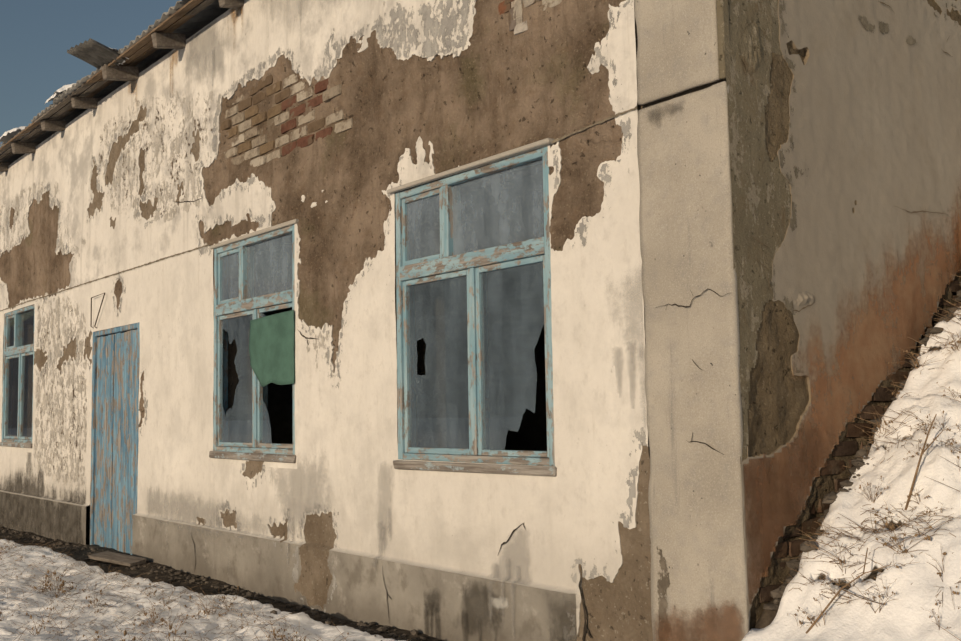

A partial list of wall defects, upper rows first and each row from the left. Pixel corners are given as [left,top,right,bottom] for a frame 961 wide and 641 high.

flaking render [927,0,961,27]
flaking render [765,42,805,164]
flaking render [86,0,633,388]
flaking render [0,182,92,486]
crack [656,289,728,308]
flaking render [267,505,339,613]
crack [498,523,525,554]
flaking render [562,427,653,641]